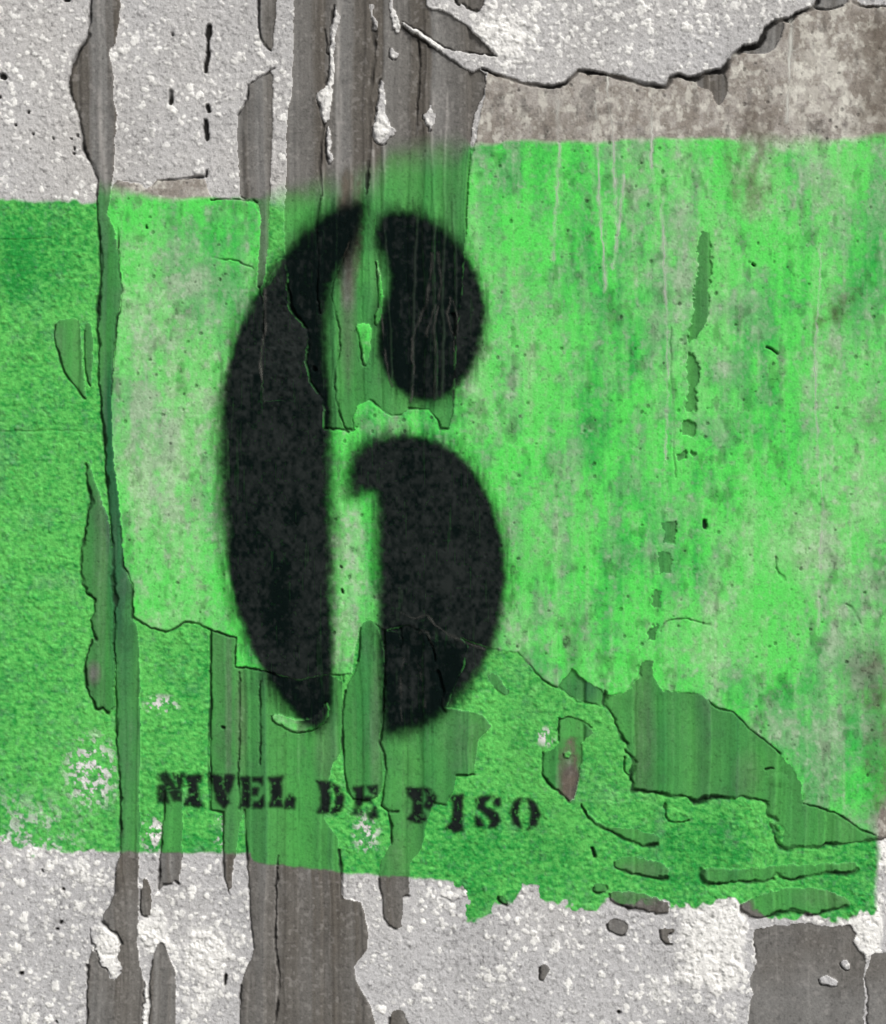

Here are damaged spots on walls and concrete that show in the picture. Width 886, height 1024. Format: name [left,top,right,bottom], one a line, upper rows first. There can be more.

peeling [210,68,275,291]
peeling [257,0,277,52]
peeling [283,0,497,433]
peeling [696,74,728,105]
peeling [739,21,784,54]
peeling [812,0,848,11]
peeling [53,0,183,1024]
peeling [207,620,491,1024]
peeling [541,660,886,1024]